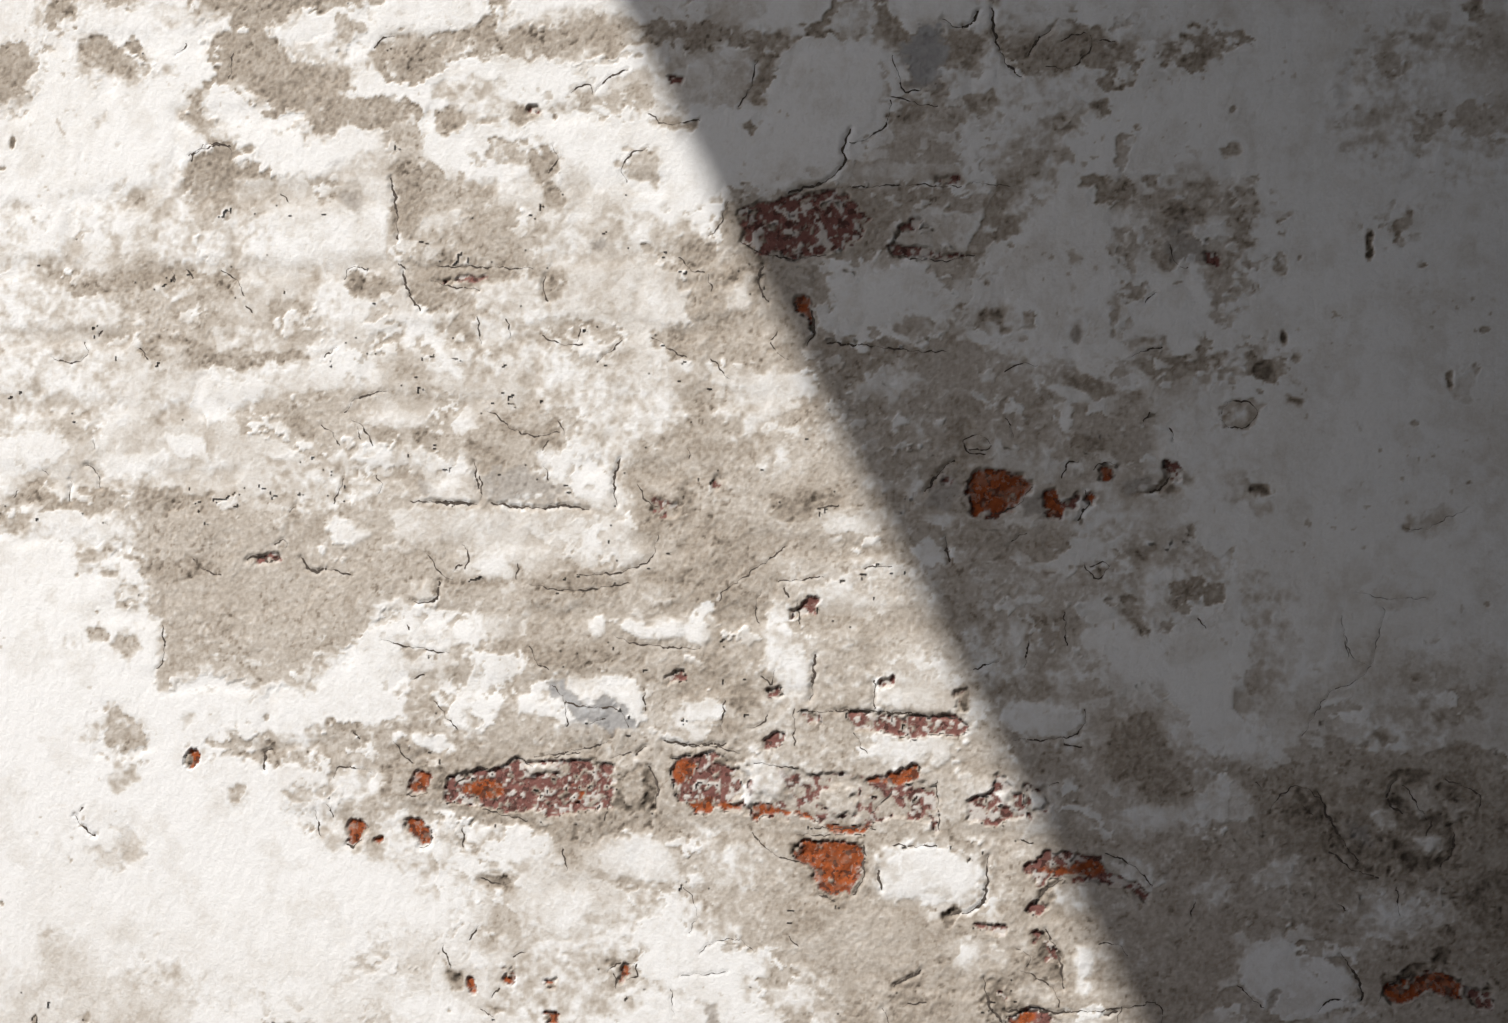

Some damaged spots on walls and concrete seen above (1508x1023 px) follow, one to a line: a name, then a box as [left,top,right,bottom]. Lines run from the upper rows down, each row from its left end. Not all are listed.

peeling [366,0,802,137]
peeling [807,0,1147,243]
peeling [1154,24,1255,75]
spalling [1220,141,1244,162]
peeling [0,0,698,576]
peeling [62,622,143,663]
flaking render [79,164,1508,1023]